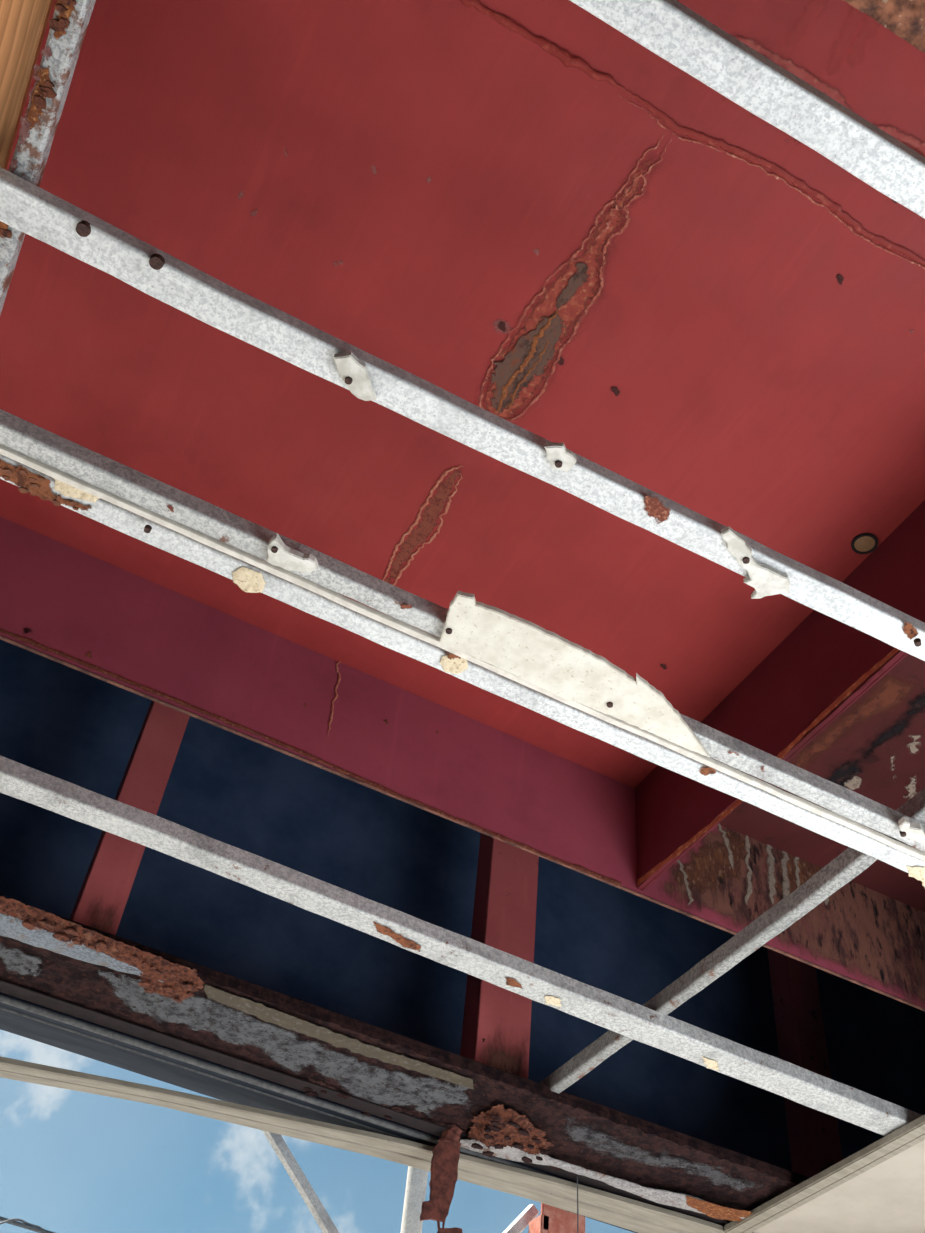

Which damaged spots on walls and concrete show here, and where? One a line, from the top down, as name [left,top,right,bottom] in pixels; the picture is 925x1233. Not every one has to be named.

corrosion [8,0,77,173]
peeling [461,0,925,422]
corrosion [0,459,92,514]
corrosion [903,622,925,640]
corrosion [0,896,204,1003]
corrosion [301,1077,562,1233]